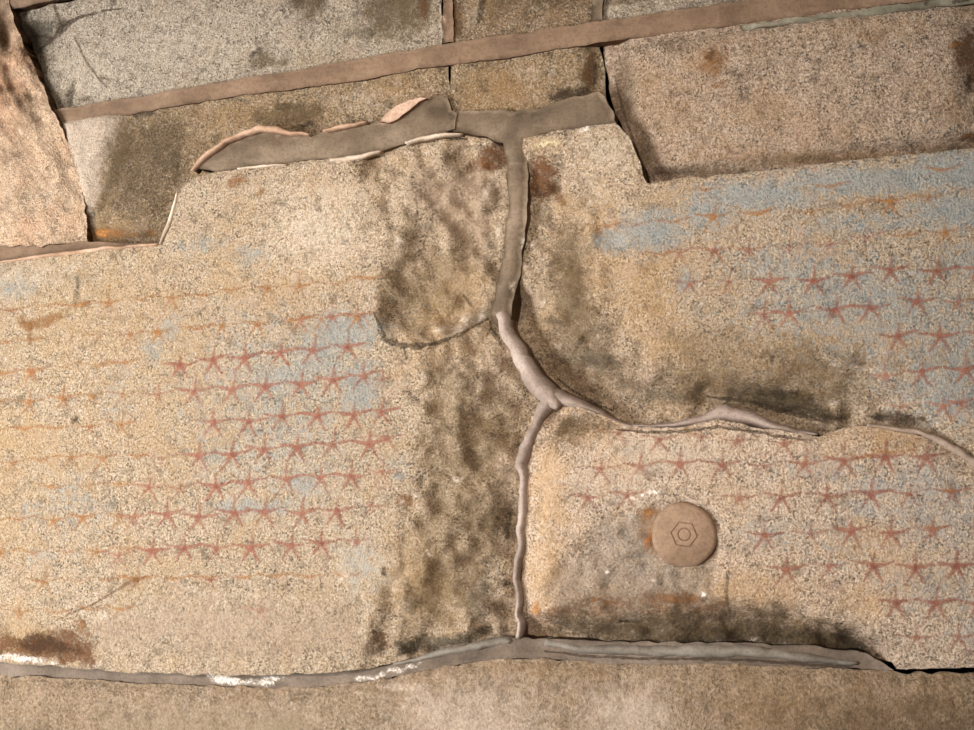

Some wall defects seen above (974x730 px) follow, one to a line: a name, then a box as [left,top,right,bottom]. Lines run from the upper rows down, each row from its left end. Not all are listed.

crack [373,295,504,359]
water stain [729,384,845,422]
rust [0,621,94,667]
water stain [397,627,492,656]
water stain [656,621,879,658]